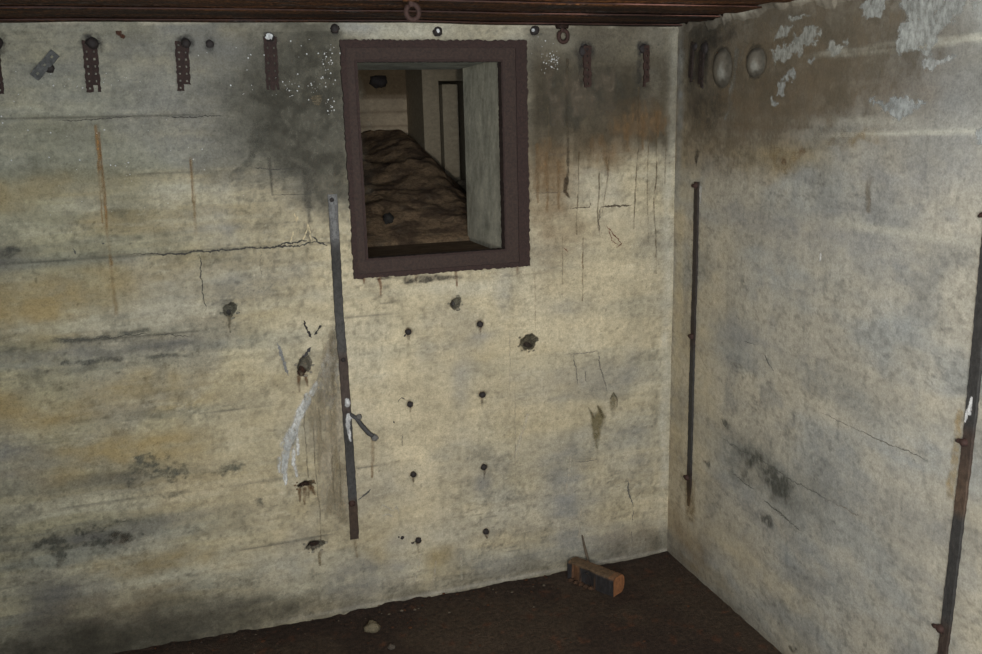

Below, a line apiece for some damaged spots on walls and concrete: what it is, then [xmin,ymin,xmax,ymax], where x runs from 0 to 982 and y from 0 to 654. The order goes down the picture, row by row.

leakage [250,42,345,240]
leakage [684,0,919,163]
crack [132,237,329,306]
leakage [278,331,352,522]
leakage [747,455,789,497]